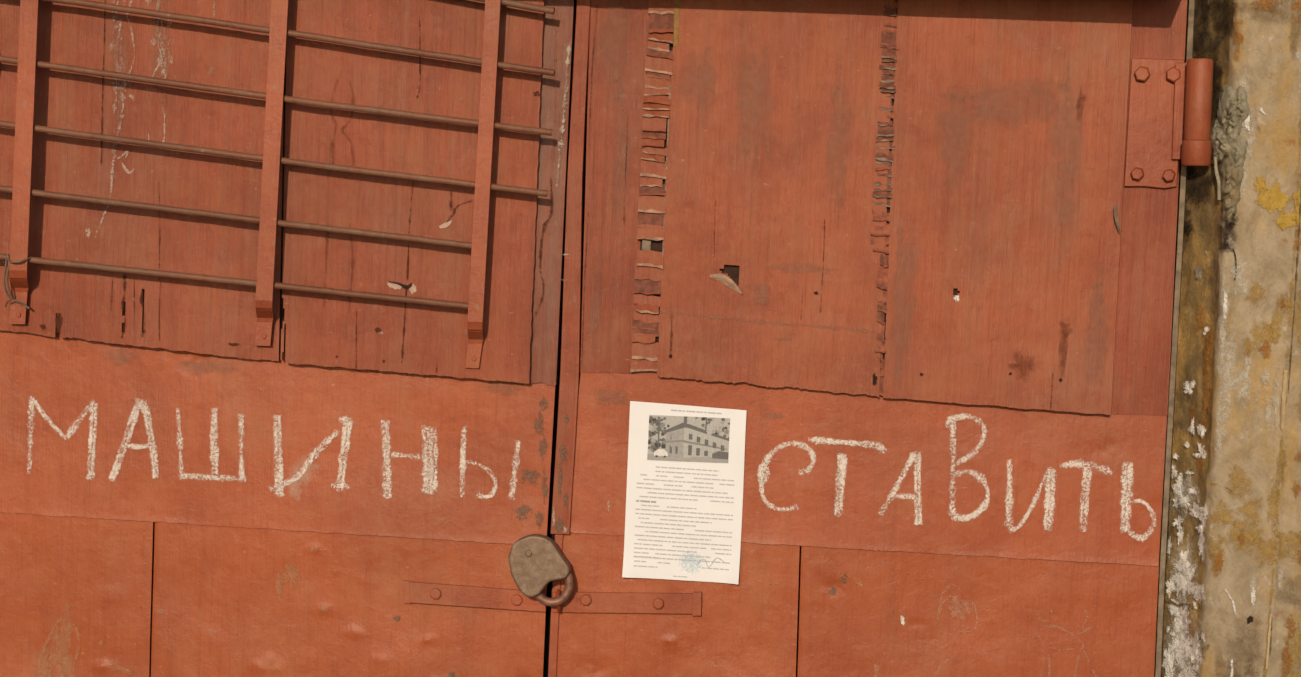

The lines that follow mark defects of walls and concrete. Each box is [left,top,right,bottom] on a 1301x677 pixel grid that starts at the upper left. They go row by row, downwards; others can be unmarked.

damp [1186,0,1236,126]
crack [111,198,161,340]
damp [1175,166,1215,275]
efflorescence [1240,112,1255,198]
efflorescence [1215,262,1279,453]
peeling [1162,418,1208,677]